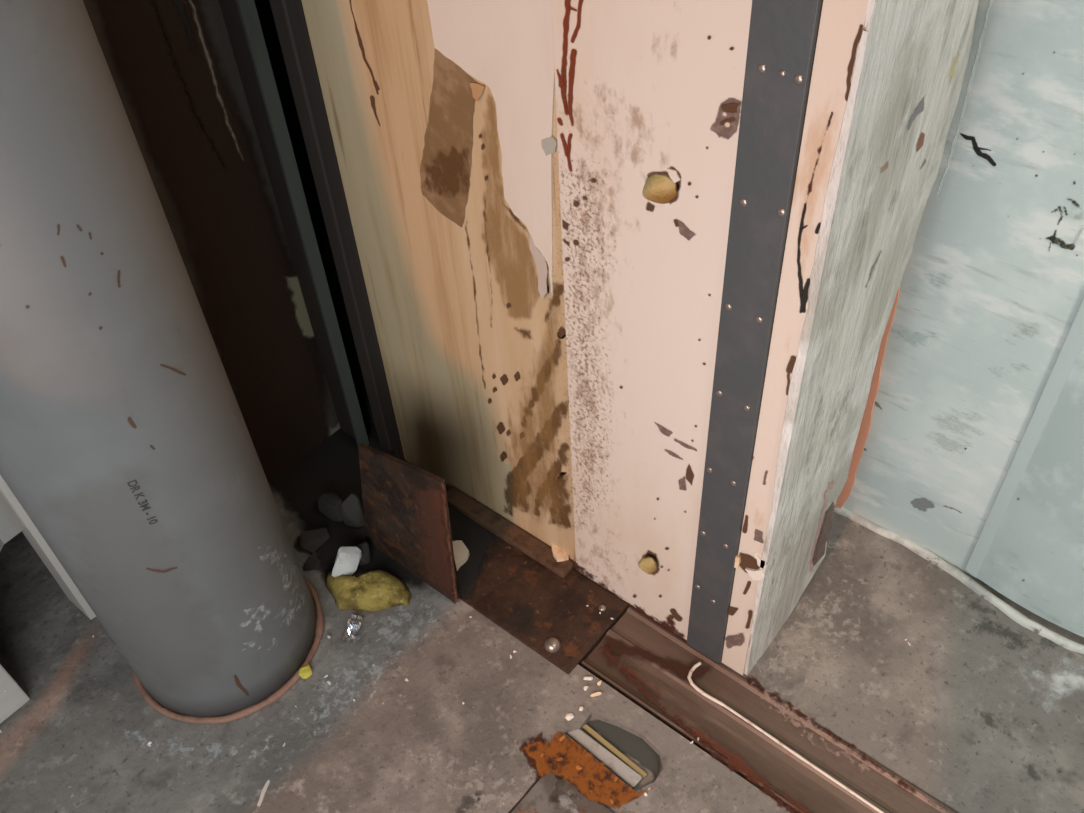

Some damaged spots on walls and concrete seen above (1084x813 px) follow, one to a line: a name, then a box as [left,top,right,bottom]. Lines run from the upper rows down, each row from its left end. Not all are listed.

rust [557,0,583,172]
peeling [427,0,558,317]
hole [643,167,681,212]
crack [960,133,996,166]
water stain [488,372,520,404]
water stain [497,170,608,528]
hole [638,550,659,575]
peeling [810,481,835,571]
rust [519,733,653,813]
rust [600,645,808,813]
rust [746,675,915,794]